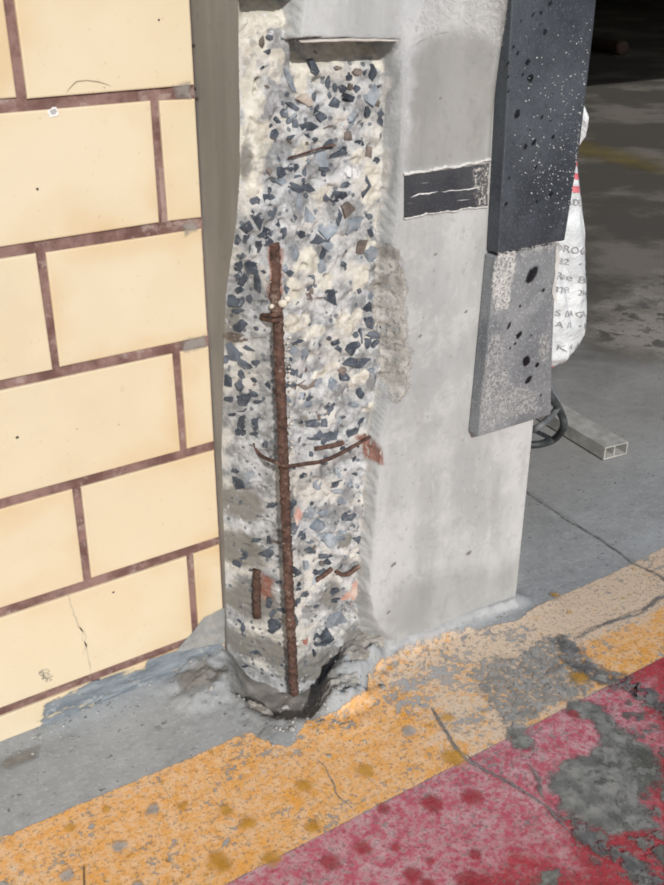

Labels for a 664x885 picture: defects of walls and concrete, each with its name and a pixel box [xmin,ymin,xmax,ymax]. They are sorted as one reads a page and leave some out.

rust [252,242,300,697]
spalling [221,0,422,703]
rust [357,436,383,464]
crack [68,593,91,673]
crack [526,491,664,717]
peeling [467,635,664,885]